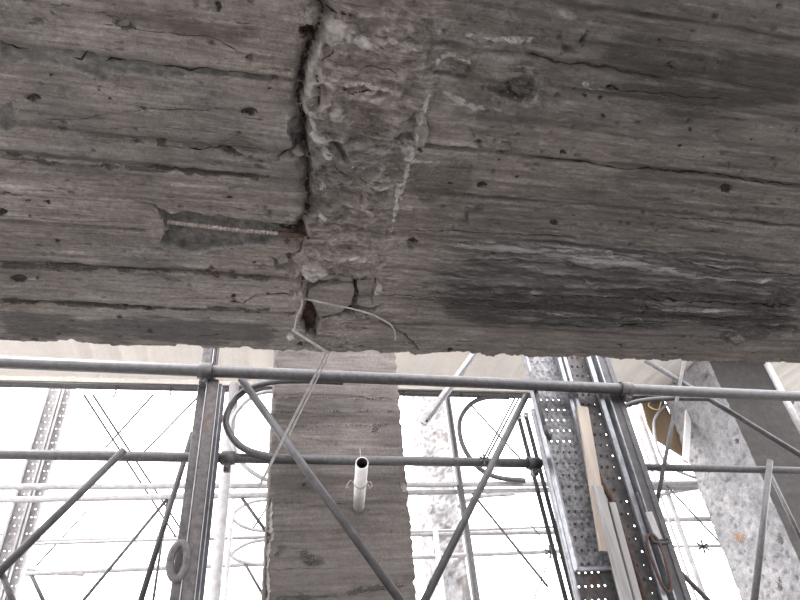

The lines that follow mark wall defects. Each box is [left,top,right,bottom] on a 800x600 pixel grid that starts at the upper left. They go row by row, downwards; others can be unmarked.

crack [529,53,715,98]
crack [48,0,372,303]
spalling [287,112,309,161]
spalling [328,137,357,165]
water stain [367,136,440,232]
spalling [389,111,429,153]
crack [536,156,795,185]
spalling [136,201,307,255]
water stain [457,244,735,282]
rust [287,300,316,335]
spalling [299,273,382,337]
water stain [654,306,732,322]